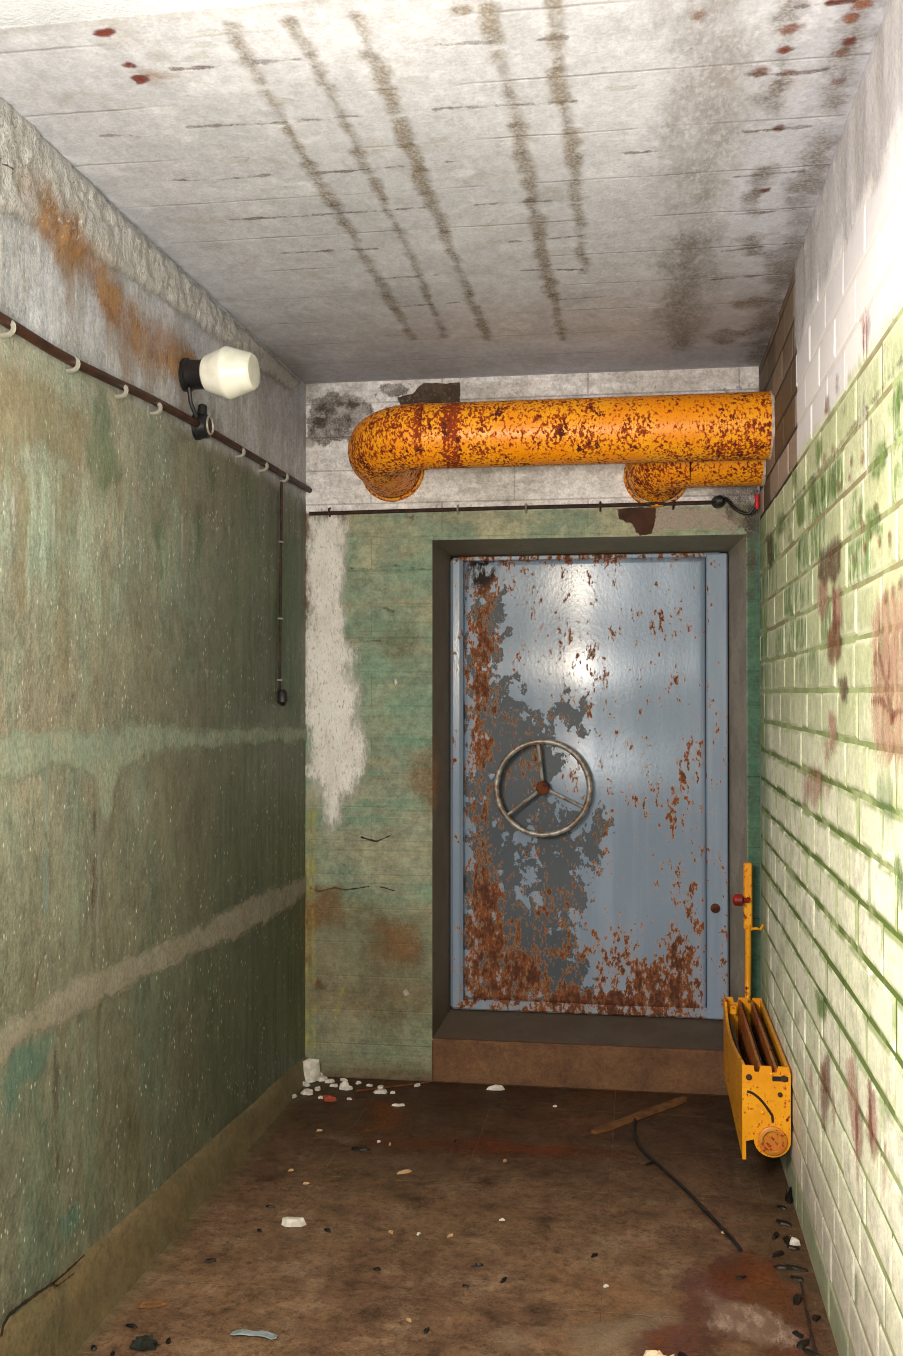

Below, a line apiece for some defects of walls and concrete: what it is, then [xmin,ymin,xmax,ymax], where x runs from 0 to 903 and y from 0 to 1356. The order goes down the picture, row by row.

rust [93,29,115,37]
rust [122,62,149,84]
damp [453,4,498,34]
damp [549,44,568,103]
rust [825,0,871,55]
damp [395,120,434,204]
damp [774,0,903,346]
damp [522,157,557,299]
rust [817,504,891,663]
damp [305,515,368,842]
rust [809,1051,885,1158]
rust [637,1253,818,1356]